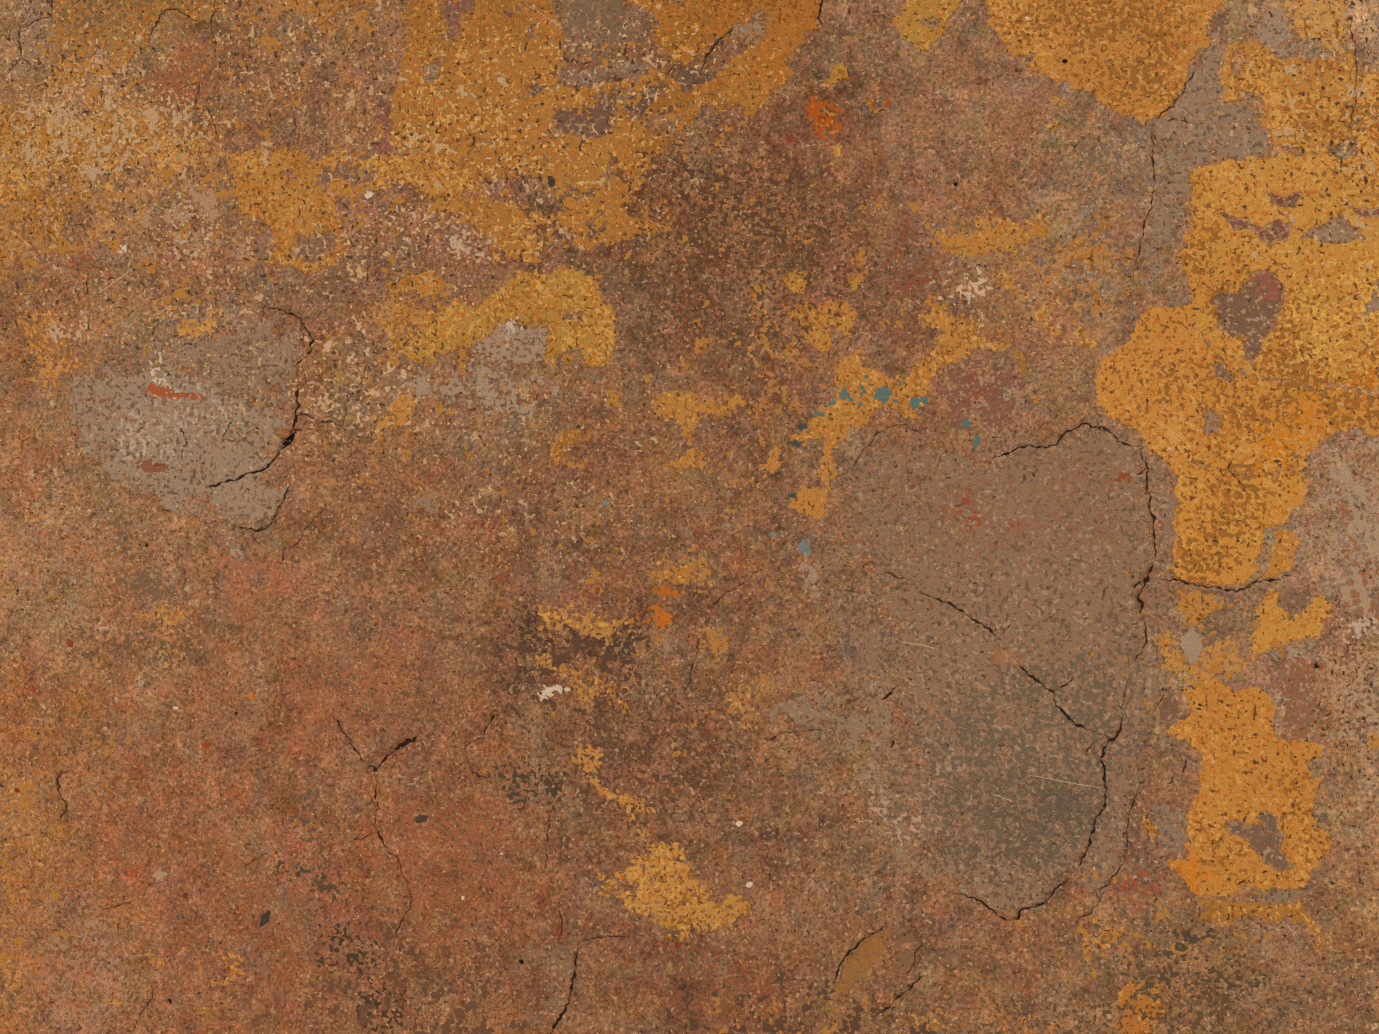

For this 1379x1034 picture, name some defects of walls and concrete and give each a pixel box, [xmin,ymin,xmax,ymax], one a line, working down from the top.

crack [204,306,369,548]
crack [851,424,920,472]
crack [880,423,1292,923]
spalling [135,724,283,879]
crack [333,717,417,955]
crack [543,809,551,868]
crack [550,903,626,1034]